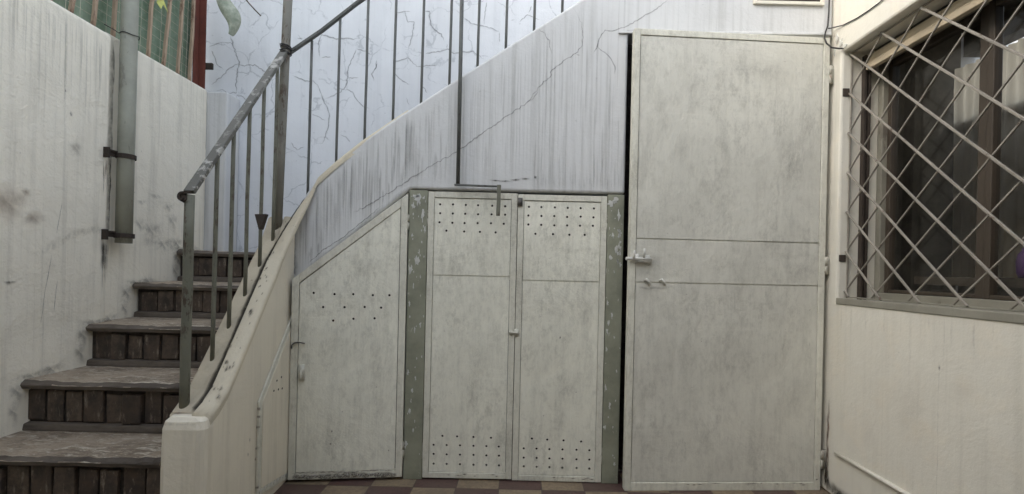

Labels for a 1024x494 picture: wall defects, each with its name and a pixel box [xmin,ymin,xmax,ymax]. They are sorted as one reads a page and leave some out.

peeling [409,194,426,288]
peeling [607,197,622,273]